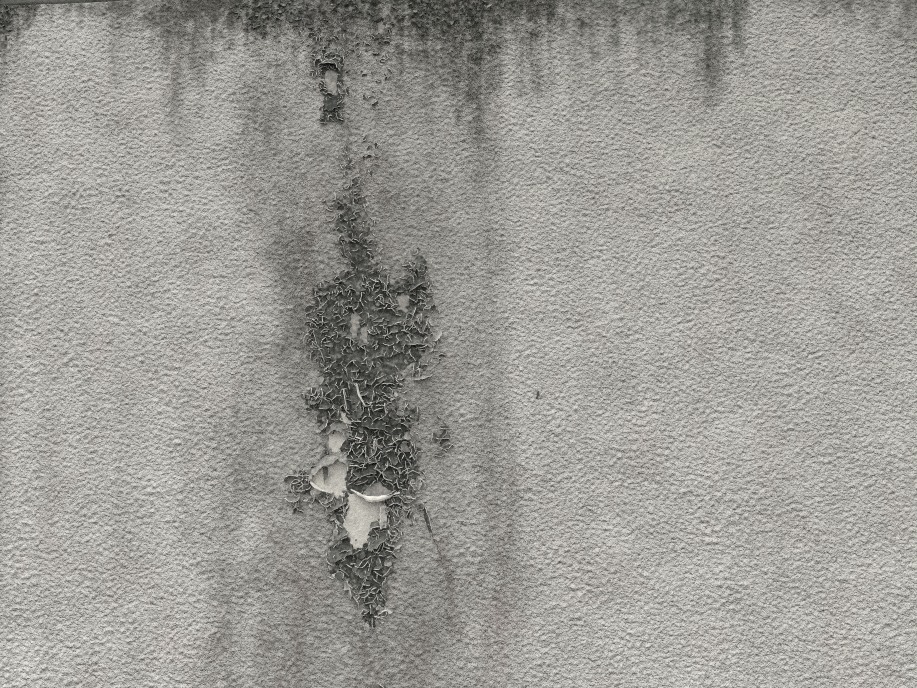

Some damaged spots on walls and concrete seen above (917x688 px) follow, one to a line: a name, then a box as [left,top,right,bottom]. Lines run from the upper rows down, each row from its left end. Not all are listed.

peeling [225,0,502,123]
peeling [283,136,454,632]